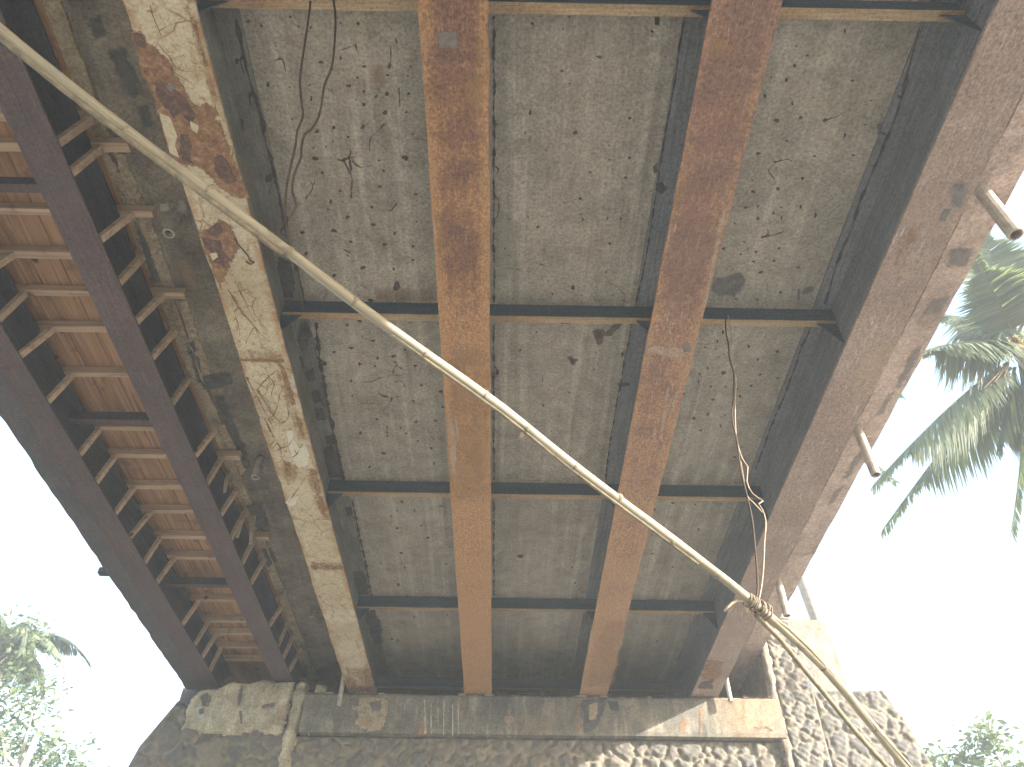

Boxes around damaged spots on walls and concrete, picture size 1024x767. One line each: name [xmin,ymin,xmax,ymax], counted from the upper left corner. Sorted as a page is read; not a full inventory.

peeling [131,29,249,199]
peeling [200,219,240,287]
leakage [712,274,745,297]
crack [227,281,307,500]